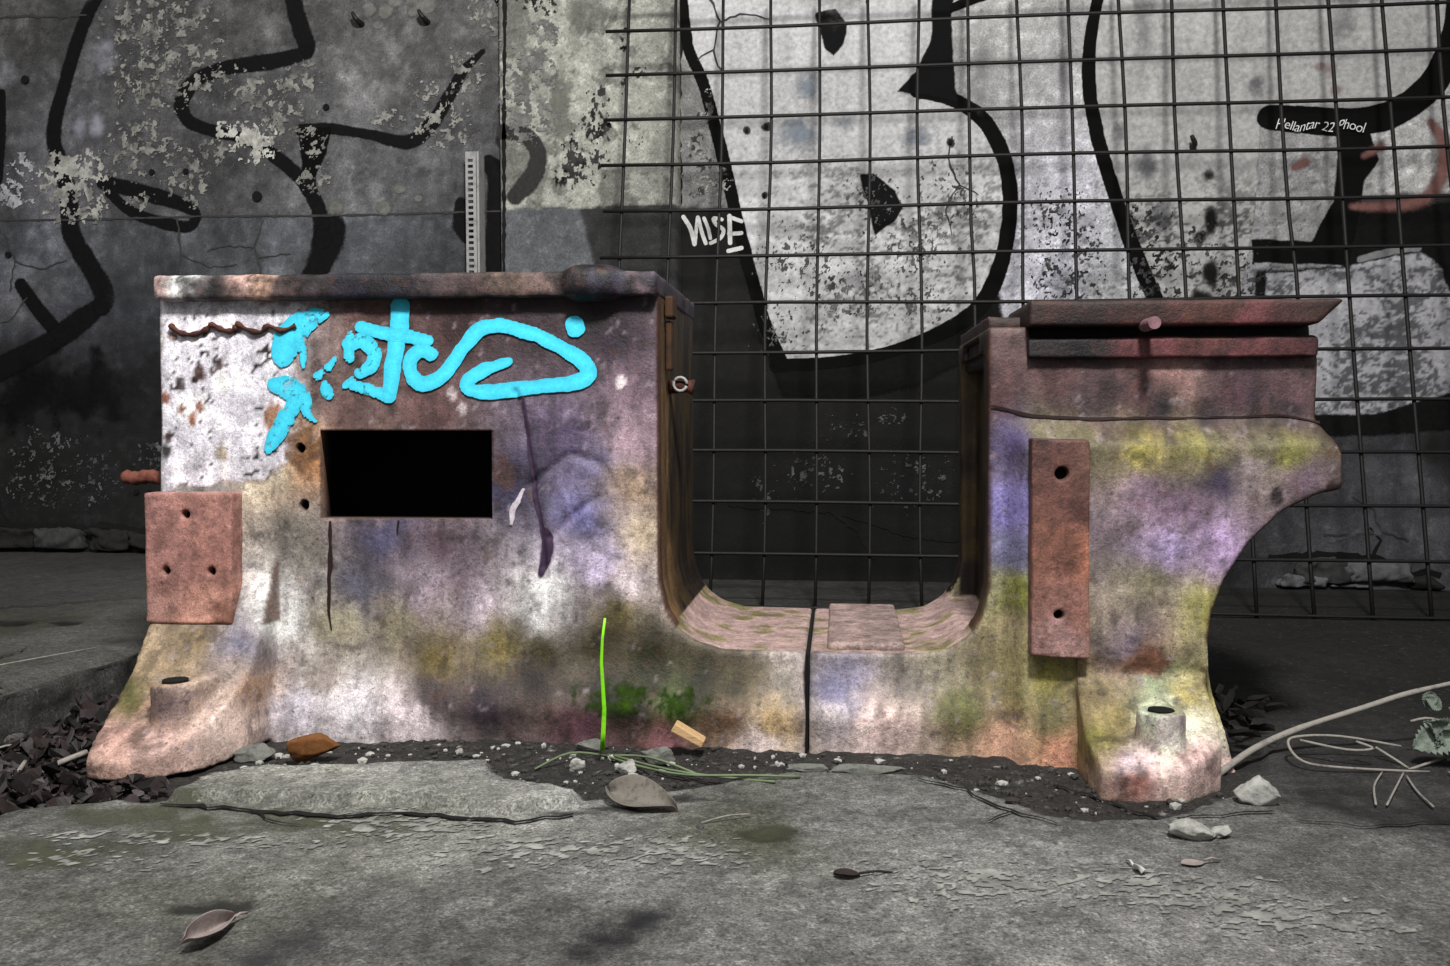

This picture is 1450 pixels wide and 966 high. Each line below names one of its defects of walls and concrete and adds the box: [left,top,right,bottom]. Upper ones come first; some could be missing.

peeling [0,0,343,225]